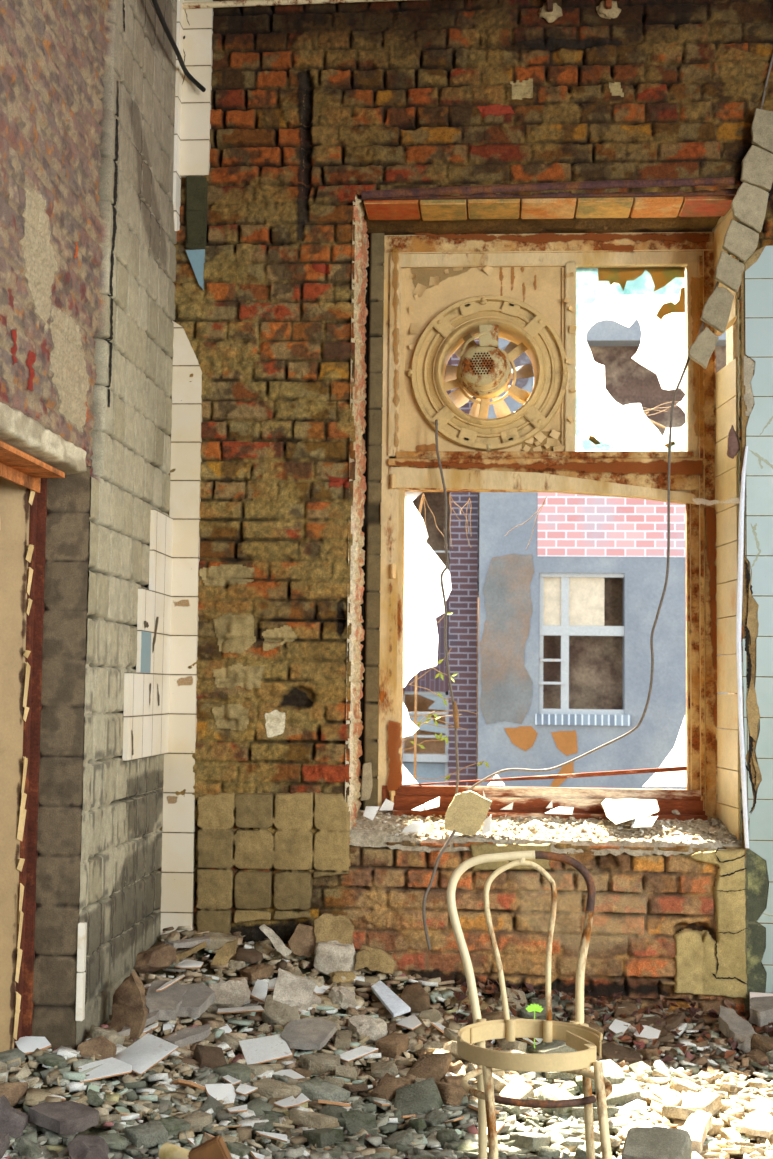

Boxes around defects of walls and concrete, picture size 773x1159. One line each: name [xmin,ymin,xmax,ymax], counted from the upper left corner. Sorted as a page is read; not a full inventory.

spalling [745,246,765,270]
rust [705,507,719,774]
crack [715,847,748,892]
crack [712,928,748,985]